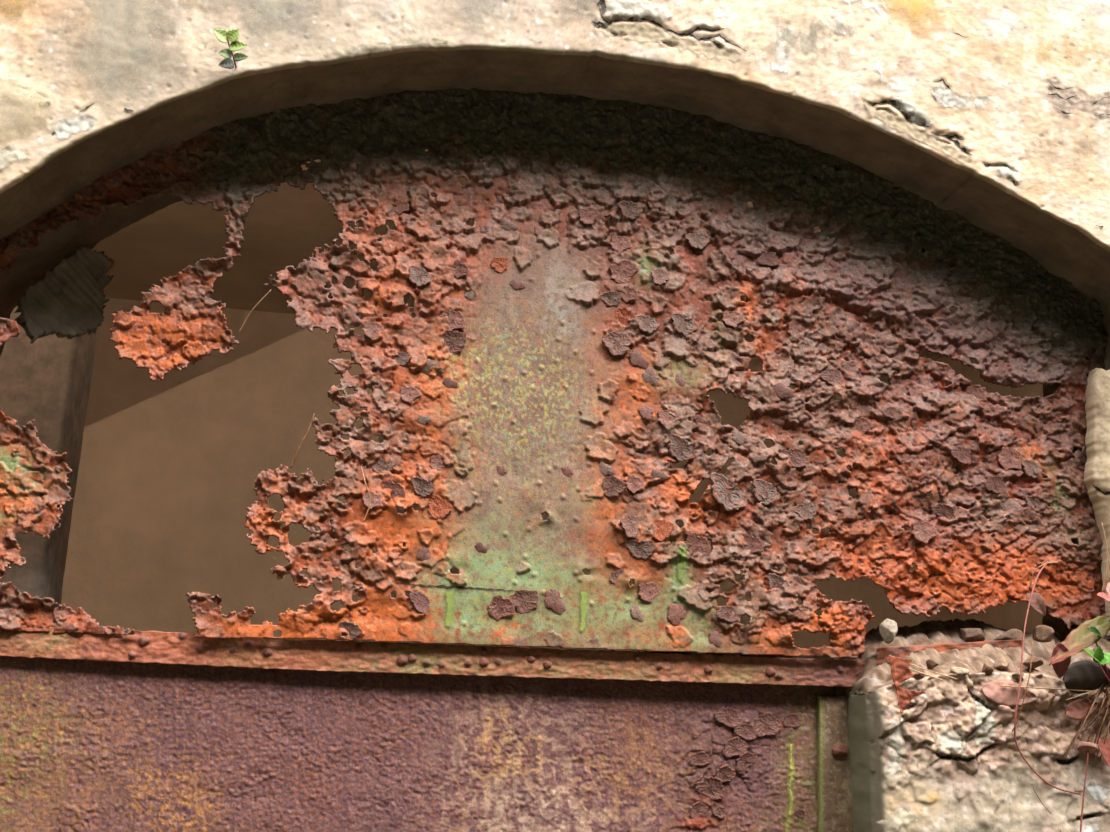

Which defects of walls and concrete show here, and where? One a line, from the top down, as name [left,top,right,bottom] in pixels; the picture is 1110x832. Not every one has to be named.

crack [591,0,746,51]
spalling [1047,79,1110,121]
spalling [863,99,973,164]
corrosion [600,234,698,386]
corrosion [363,454,453,519]
corrosion [599,461,667,497]
corrosion [710,472,780,511]
corrosion [339,621,362,641]
corrosion [487,589,566,620]
corrosion [688,707,783,783]
spalling [886,719,905,775]
spalling [931,701,997,755]